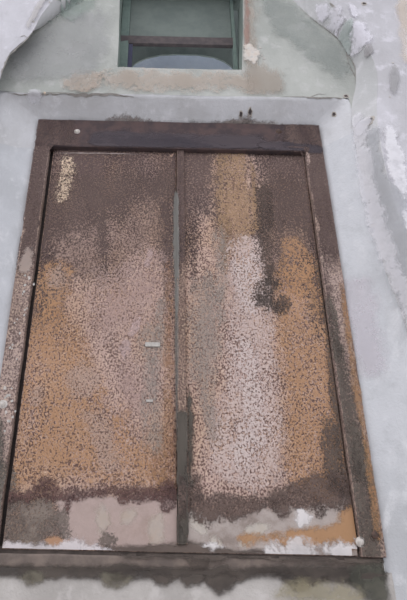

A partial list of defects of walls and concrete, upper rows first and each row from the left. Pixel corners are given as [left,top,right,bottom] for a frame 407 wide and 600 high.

crack [10,89,133,97]
spalling [243,44,265,67]
peeling [315,2,374,56]
spalling [389,62,399,98]
corrosion [215,153,259,270]
peeling [367,116,407,278]
corrosion [8,237,356,547]
damp [0,114,389,600]
corrosion [353,382,382,540]